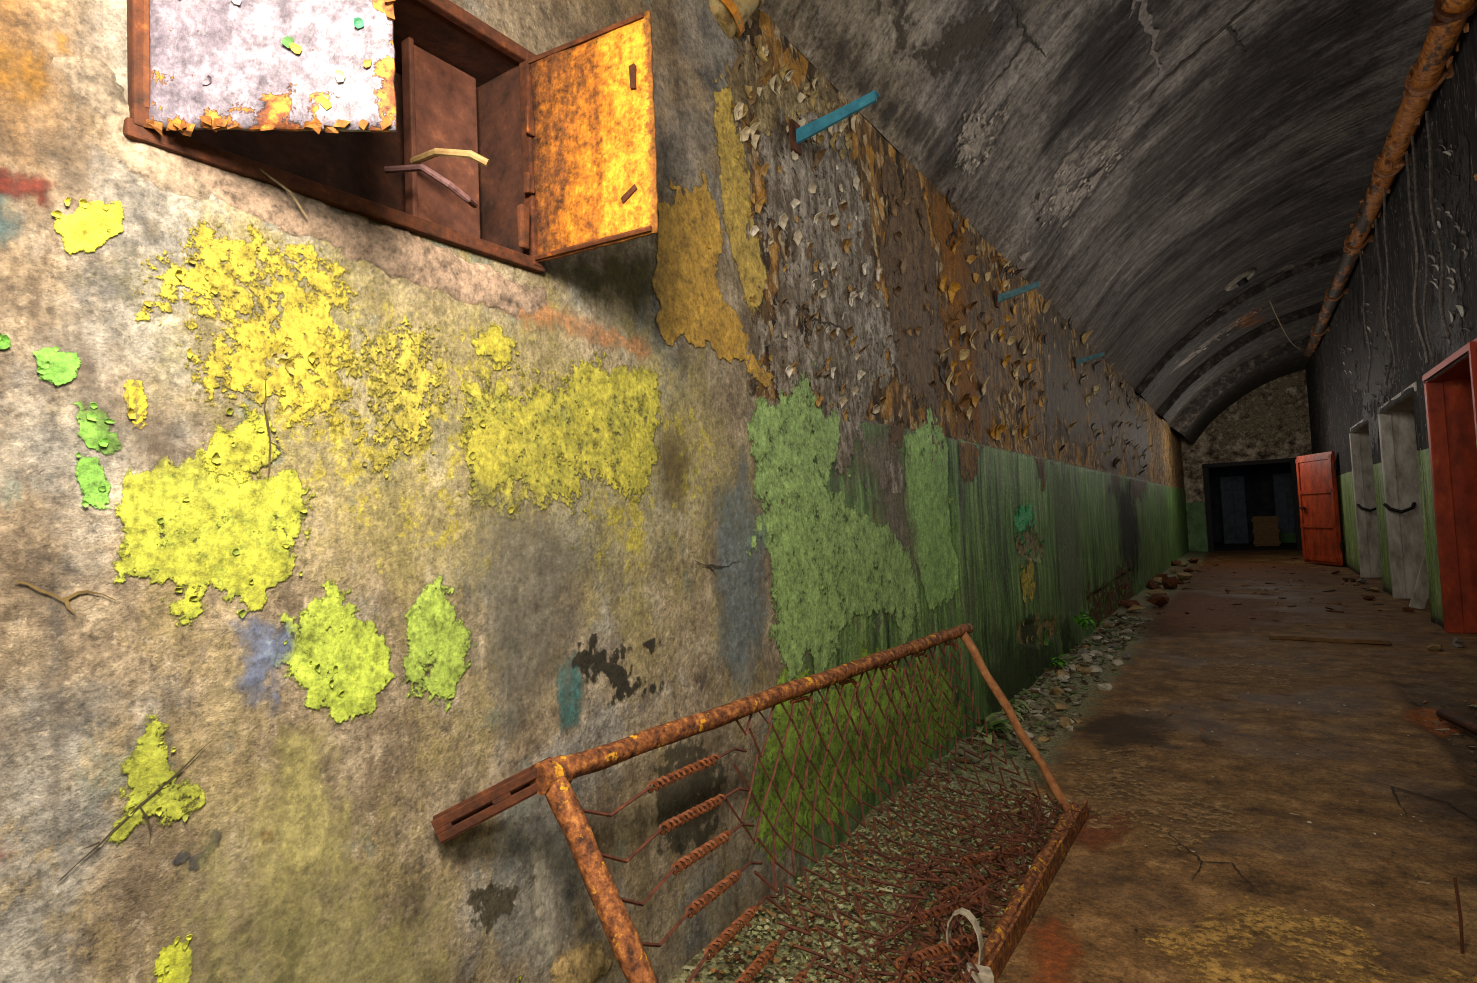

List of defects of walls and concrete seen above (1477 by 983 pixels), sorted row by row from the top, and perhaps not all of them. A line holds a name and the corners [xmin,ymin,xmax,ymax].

crack [972,0,1047,114]
leakage [547,255,654,309]
leakage [662,441,687,500]
leakage [857,425,920,591]
peeling [652,34,1155,869]
leakage [489,519,664,730]
leakage [173,828,222,871]
leakage [270,923,313,983]
leakage [283,736,338,865]
leakage [467,831,552,966]
leakage [654,738,727,855]
crack [1339,771,1477,820]